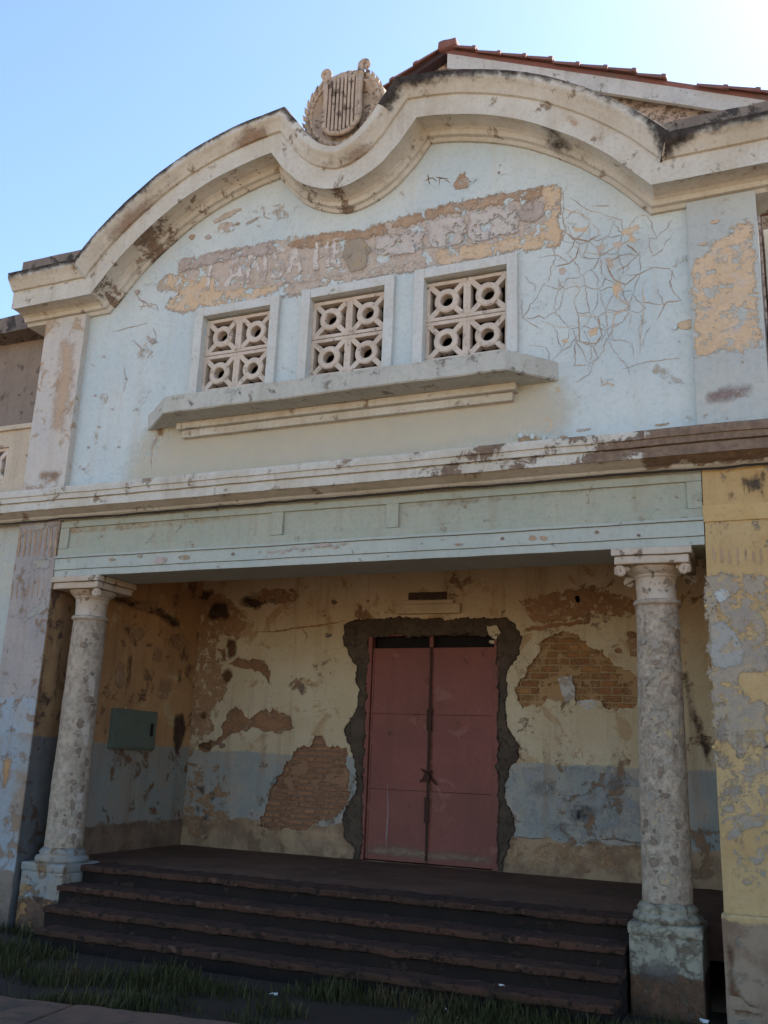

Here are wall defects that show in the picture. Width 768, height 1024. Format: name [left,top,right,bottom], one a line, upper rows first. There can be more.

leakage [378,69,768,162]
peeling [94,275,127,308]
peeling [134,195,257,263]
flaking render [154,170,564,315]
crack [521,187,680,392]
flaking render [673,222,765,358]
peeling [431,418,768,477]
flaking render [183,587,649,871]
peeling [703,547,768,892]
flaking render [642,818,681,873]